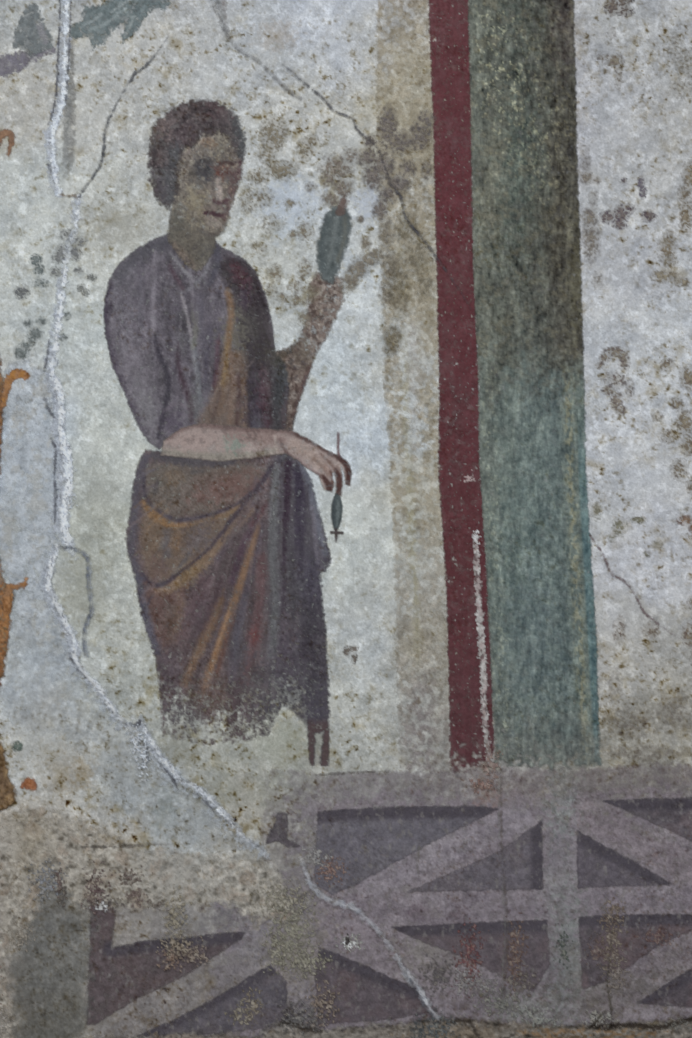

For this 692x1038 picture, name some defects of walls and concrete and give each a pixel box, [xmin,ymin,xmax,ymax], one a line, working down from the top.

crack [276,68,382,156]
crack [390,184,447,271]
crack [41,0,257,846]
peeling [470,530,503,793]
crack [92,842,156,850]
crack [303,868,373,951]
flaking render [0,806,692,1038]
crack [396,955,435,1015]